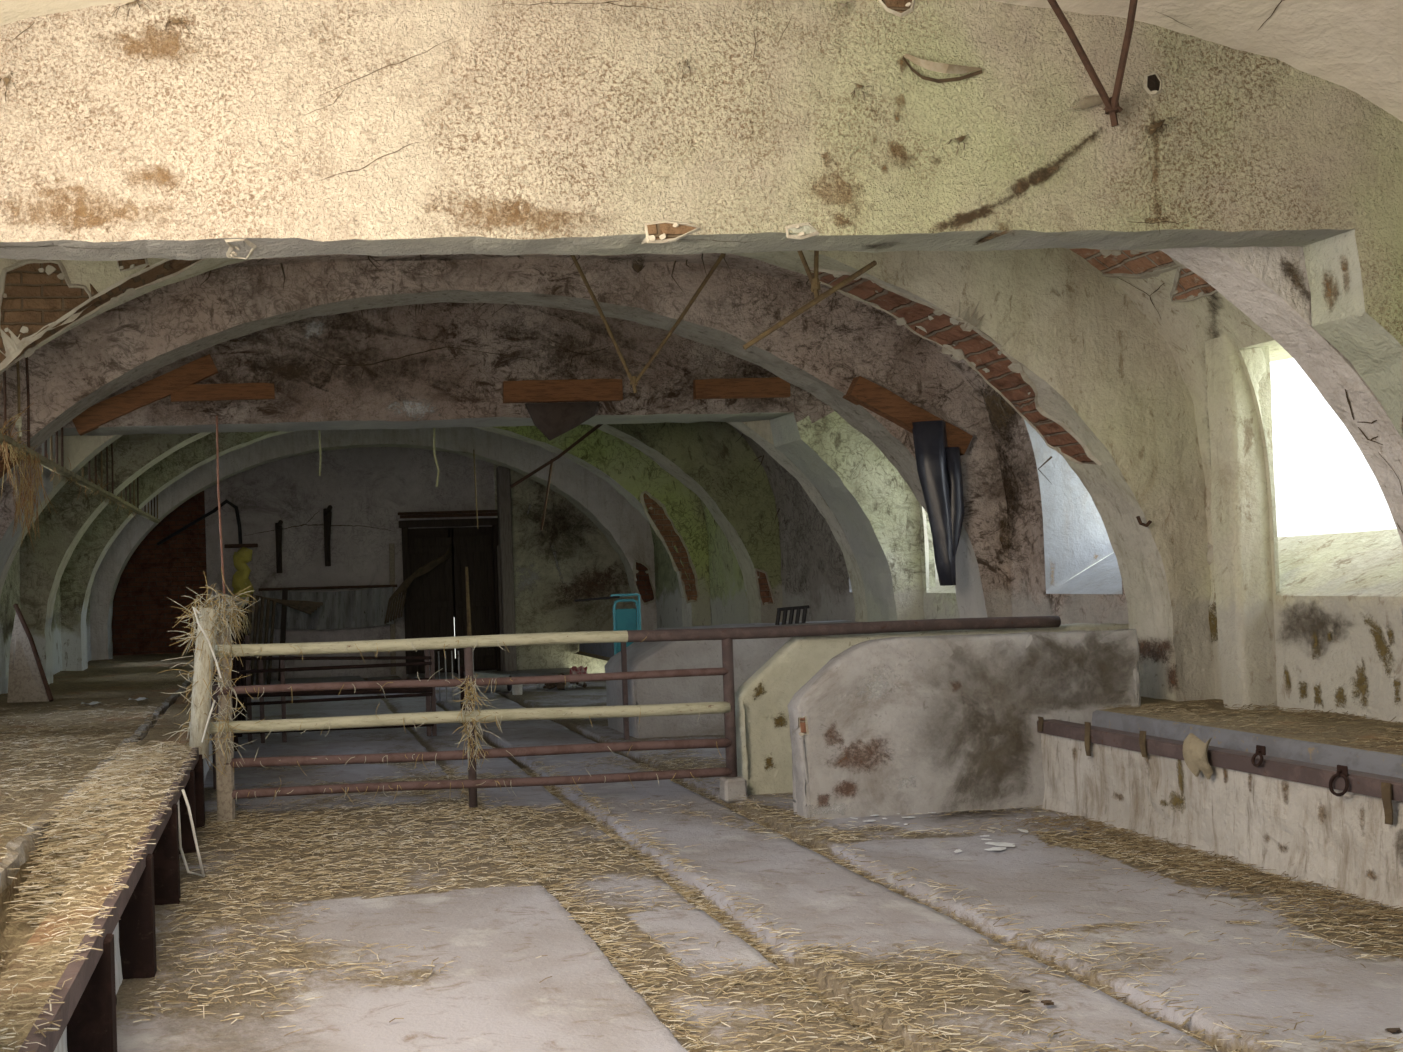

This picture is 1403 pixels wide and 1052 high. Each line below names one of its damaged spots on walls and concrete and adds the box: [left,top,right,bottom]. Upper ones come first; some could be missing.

crack [303,38,453,116]
peeling [903,54,982,83]
damp [873,137,914,171]
damp [934,128,1102,243]
spalling [641,220,701,245]
spalling [1065,248,1218,303]
spalling [0,258,209,374]
damp [306,313,430,340]
spalling [809,267,1102,466]
spalling [640,491,700,604]
spalling [632,560,656,605]
damp [1282,605,1341,652]